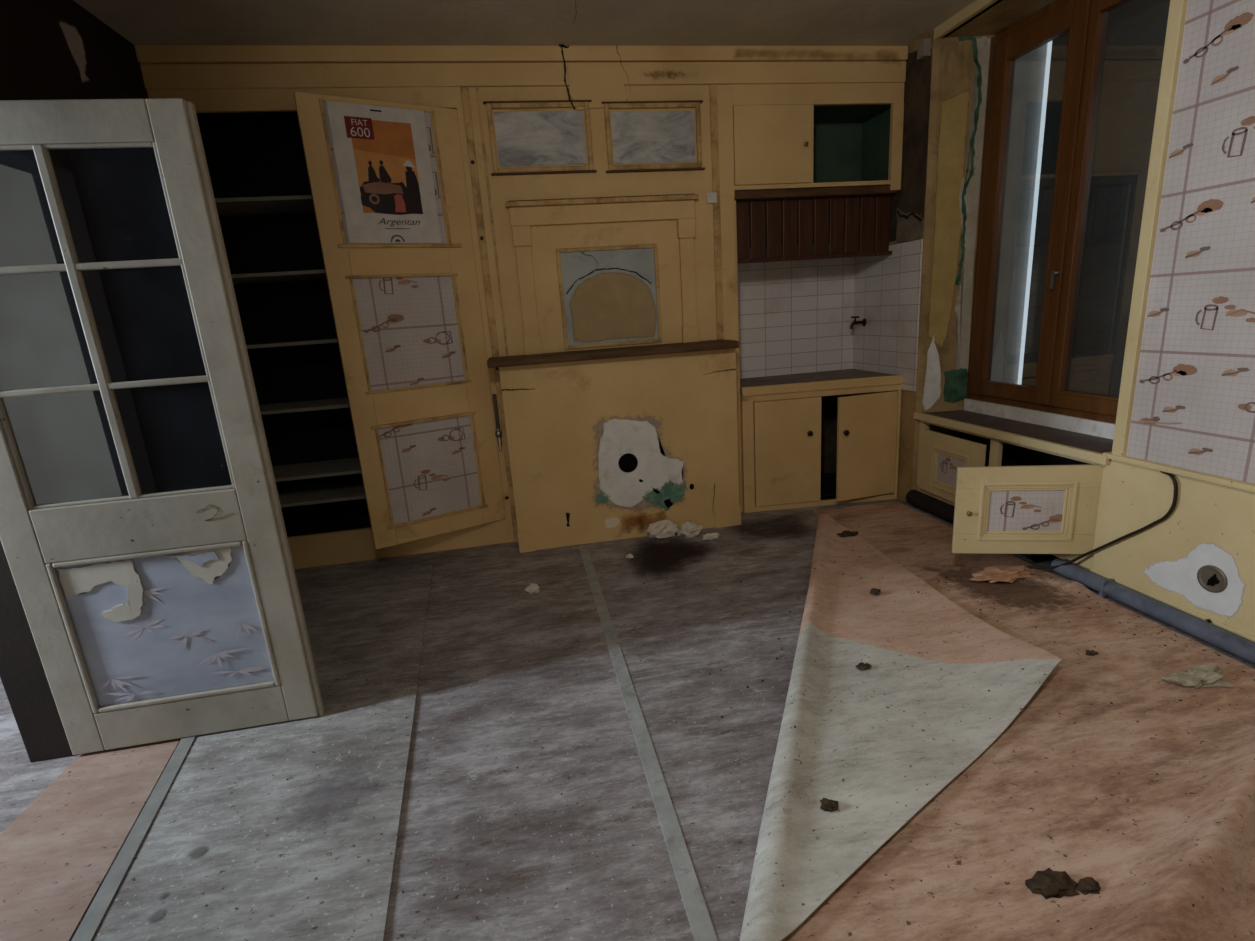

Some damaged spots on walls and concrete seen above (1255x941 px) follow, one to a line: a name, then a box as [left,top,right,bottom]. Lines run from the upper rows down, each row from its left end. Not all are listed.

crack [558,0,577,110]
peeling [594,416,694,528]
damp [631,539,709,574]